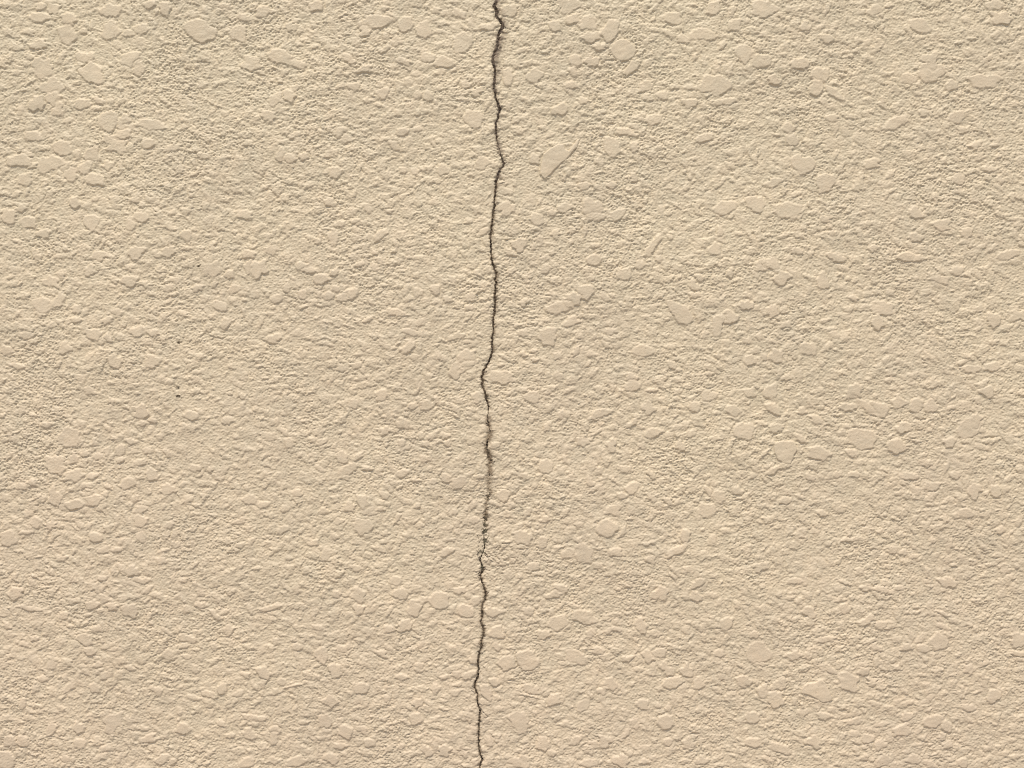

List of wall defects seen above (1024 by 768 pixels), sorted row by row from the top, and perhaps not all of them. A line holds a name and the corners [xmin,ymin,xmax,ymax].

crack [473,0,505,768]